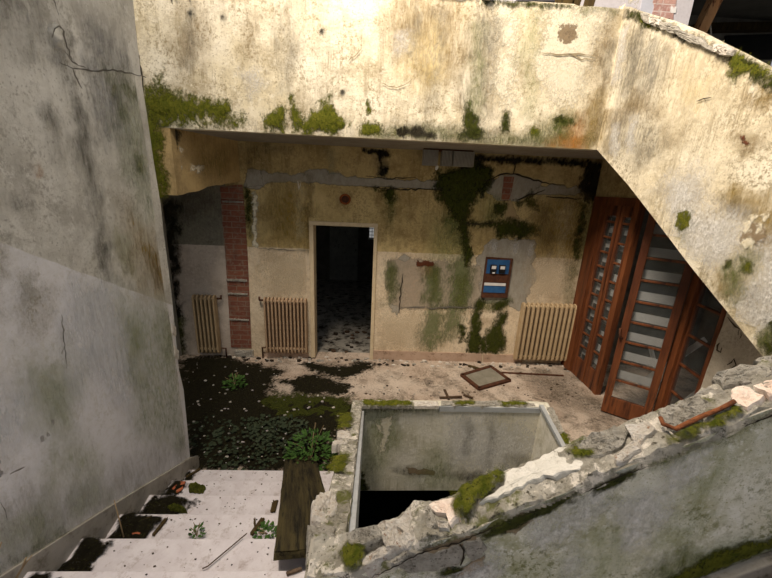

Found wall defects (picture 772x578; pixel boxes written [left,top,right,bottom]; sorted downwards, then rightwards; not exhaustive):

crack [59,52,146,88]
spalling [746,61,772,95]
flaking render [220,184,254,357]
flaking render [385,254,482,315]
corrosion [658,399,737,431]
water stain [403,465,444,486]
spalling [307,359,772,578]